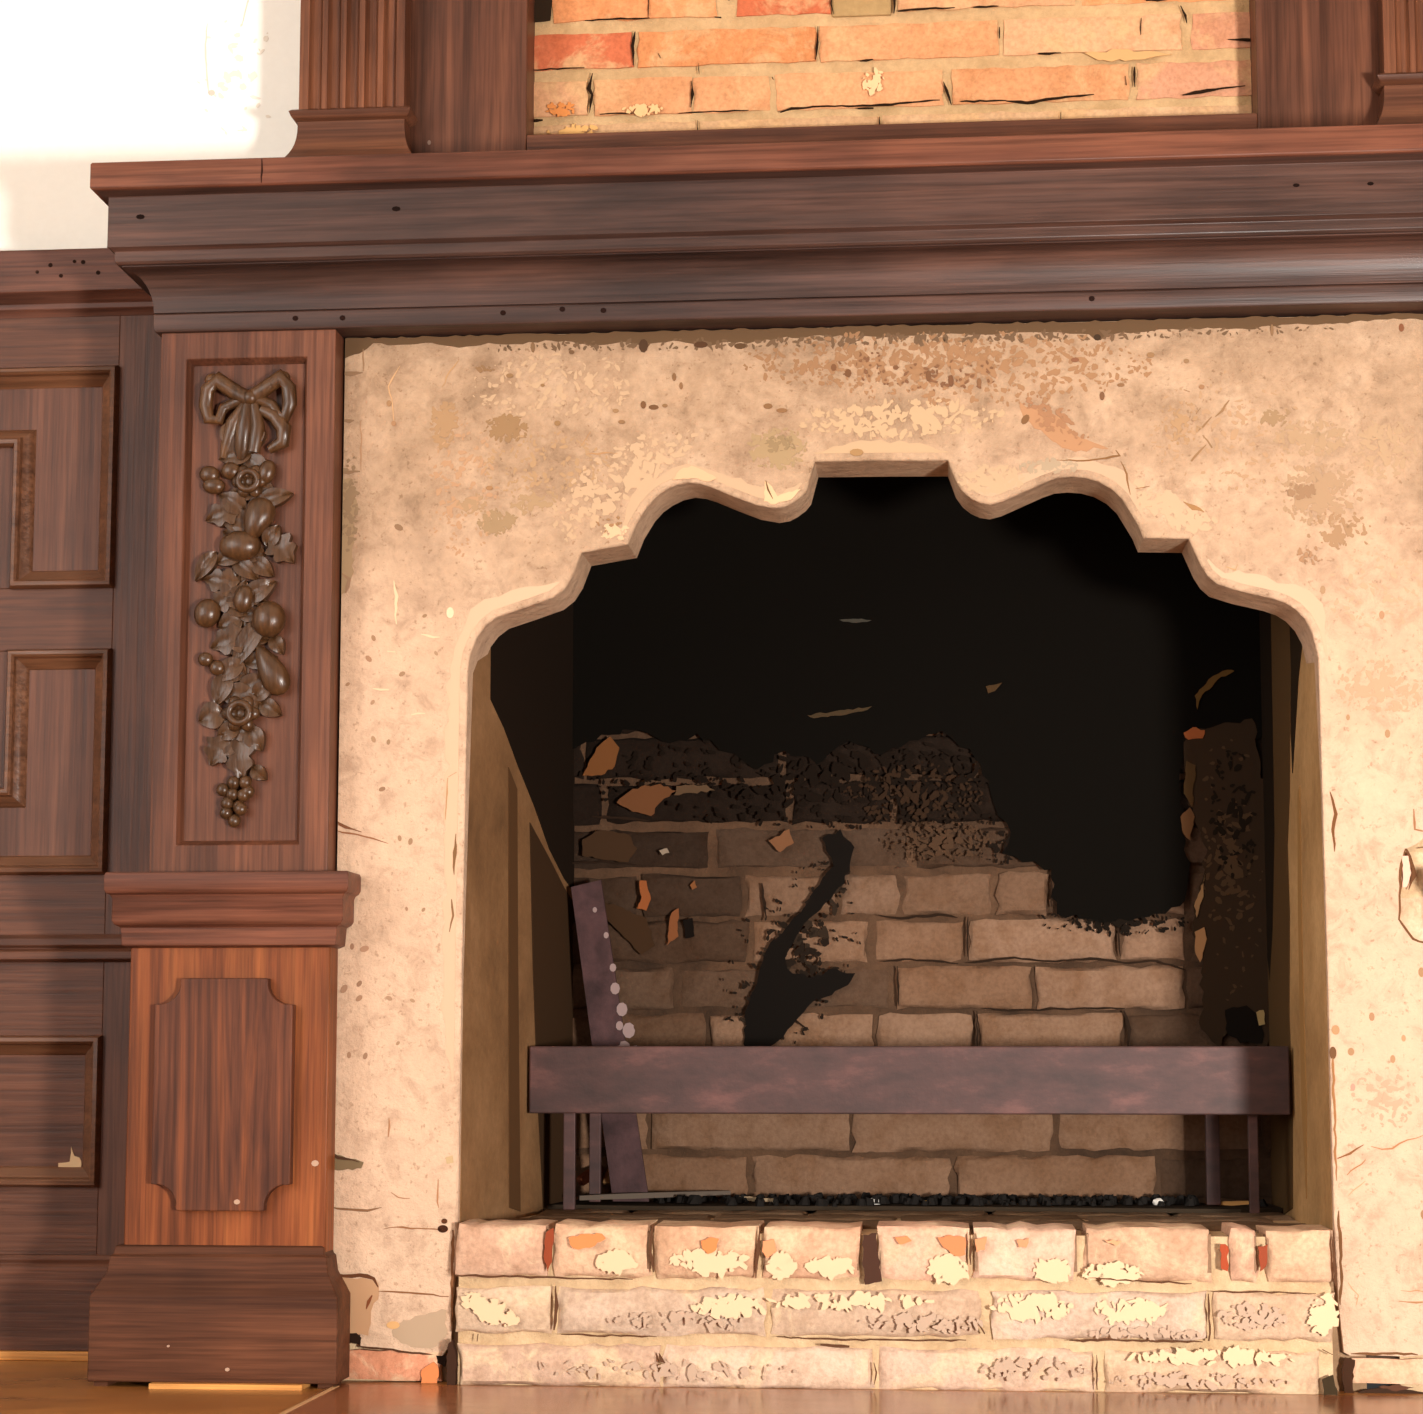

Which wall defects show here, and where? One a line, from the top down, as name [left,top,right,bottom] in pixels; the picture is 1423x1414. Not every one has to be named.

spalling [1184,727,1205,740]
spalling [583,737,619,776]
spalling [617,784,713,816]
spalling [637,880,651,910]
flaking render [1400,852,1423,941]
spalling [667,908,679,945]
spalling [1194,876,1207,962]
peeling [610,963,637,1046]
spalling [544,1228,606,1271]
spalling [938,1235,987,1256]
flaking render [342,1277,443,1383]
flaking render [1351,1355,1423,1391]